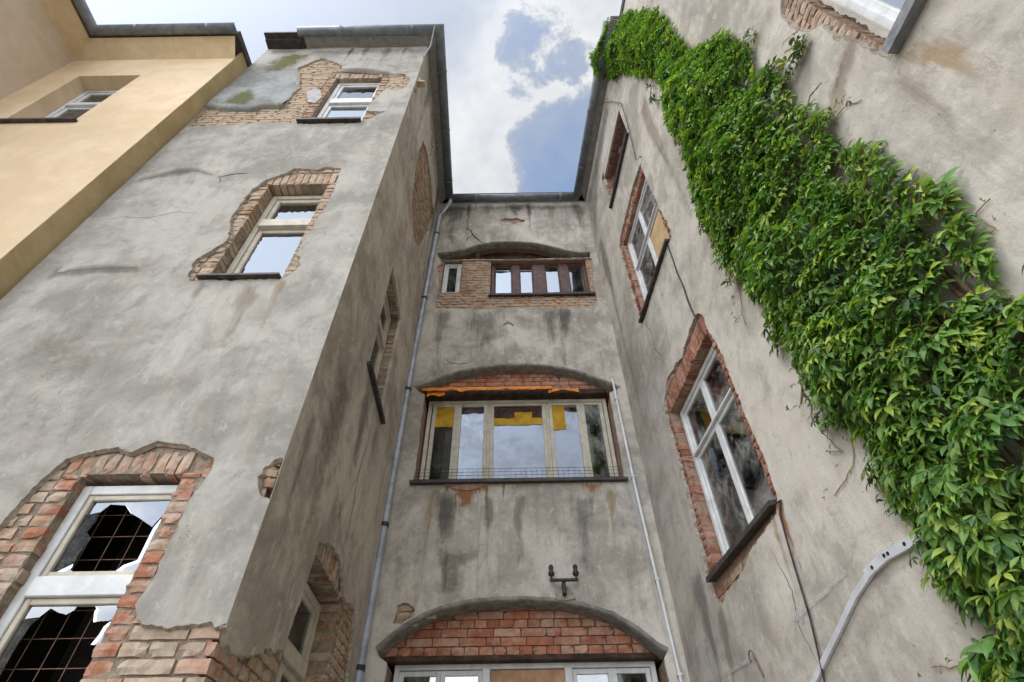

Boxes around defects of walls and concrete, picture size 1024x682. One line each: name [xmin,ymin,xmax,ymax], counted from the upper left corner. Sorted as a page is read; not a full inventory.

spalling [780,0,893,60]
damp [227,90,253,104]
spalling [187,58,344,127]
damp [268,54,307,71]
spalling [321,73,425,124]
spalling [187,167,341,282]
spalling [412,141,434,249]
spalling [664,313,777,605]
damp [429,496,453,533]
rust [445,486,488,507]
spalling [0,440,355,682]
spalling [393,603,437,629]